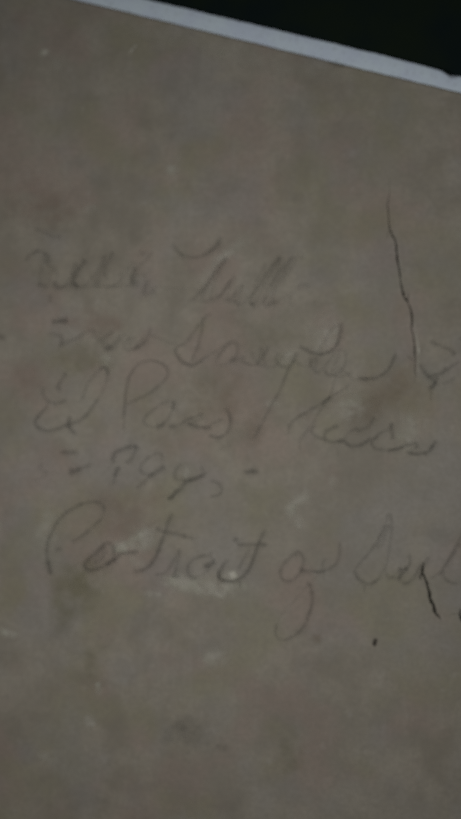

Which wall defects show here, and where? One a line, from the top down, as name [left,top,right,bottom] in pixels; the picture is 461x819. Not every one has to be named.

crack [387,206,420,362]
crack [421,566,461,619]